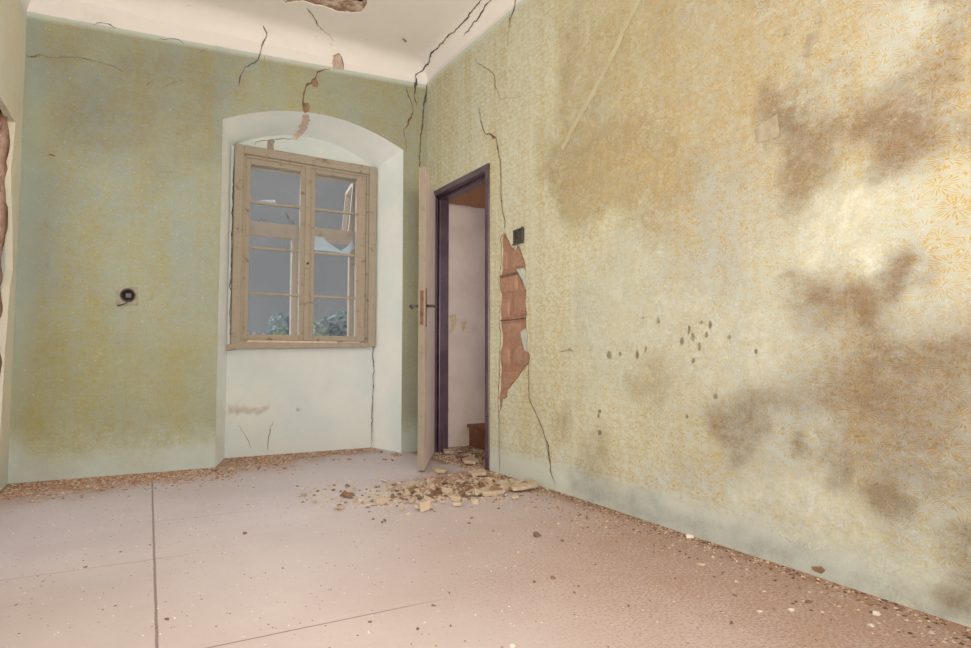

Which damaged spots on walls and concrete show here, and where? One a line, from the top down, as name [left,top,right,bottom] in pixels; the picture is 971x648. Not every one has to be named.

flaking render [0,109,10,318]
crack [239,26,267,83]
crack [302,68,330,111]
spalling [284,0,367,12]
crack [403,0,491,167]
crack [479,111,505,228]
leakage [799,179,897,326]
leakage [853,93,935,161]
spalling [498,233,530,412]
leakage [604,268,782,383]
crack [528,362,555,483]
leakage [731,473,881,554]